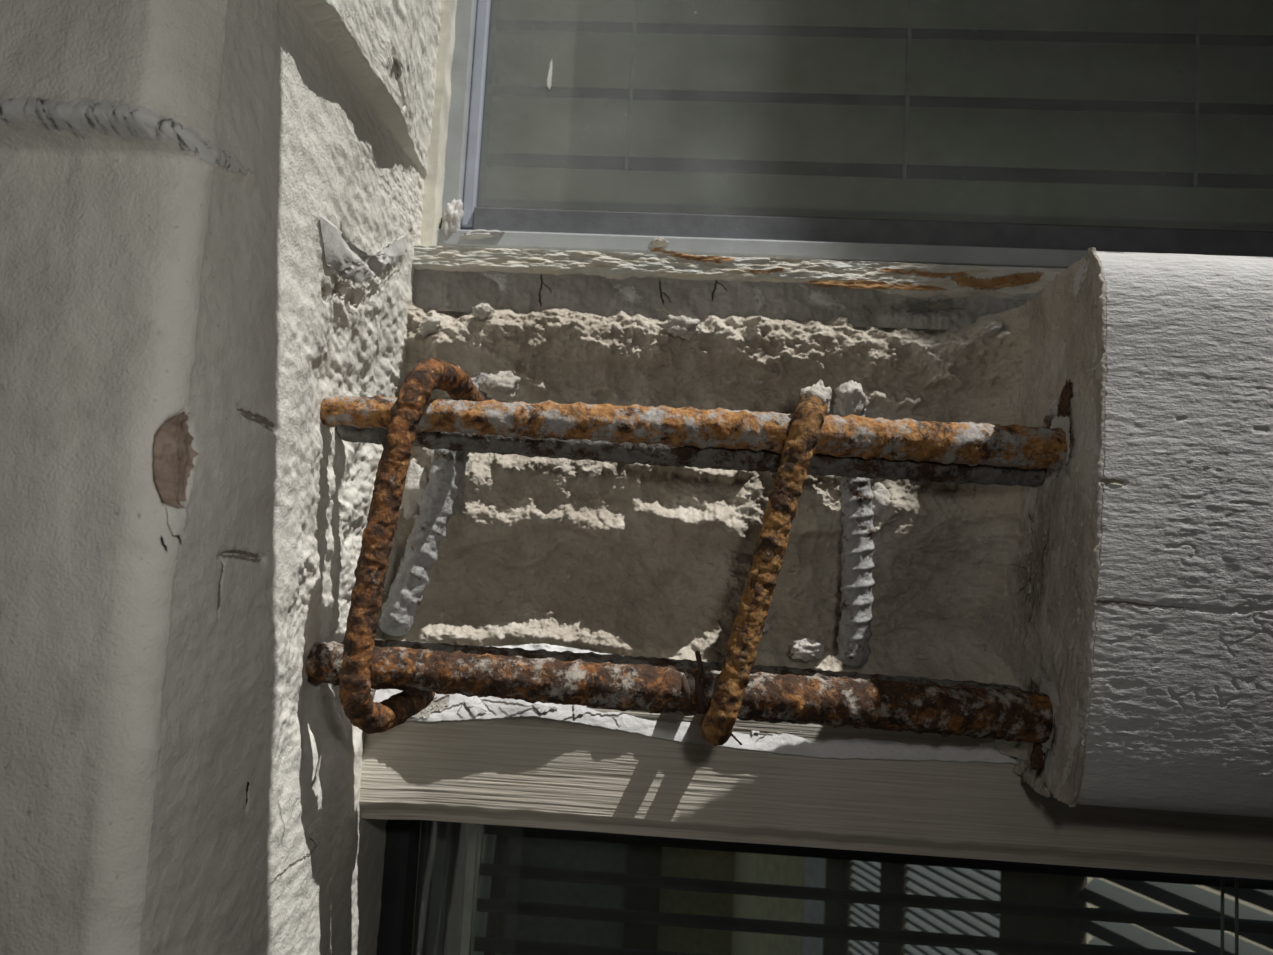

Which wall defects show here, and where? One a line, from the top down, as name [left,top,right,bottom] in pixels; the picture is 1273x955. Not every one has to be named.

corrosion [650,248,736,263]
corrosion [808,268,1042,291]
spalling [320,394,397,445]
corrosion [1043,380,1075,475]
spalling [153,411,198,536]
spalling [370,301,1067,761]
crack [1093,600,1200,609]
spalling [306,641,344,686]
corrosion [1030,713,1056,777]